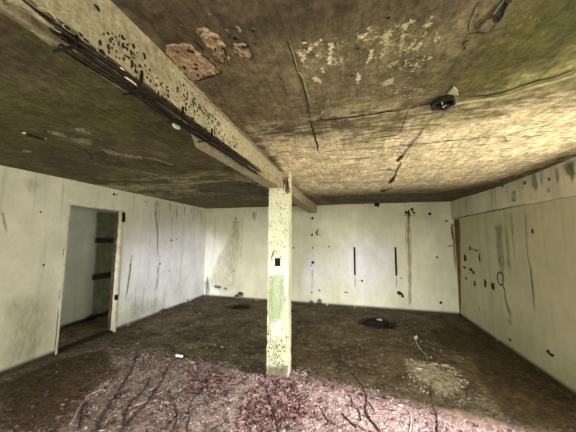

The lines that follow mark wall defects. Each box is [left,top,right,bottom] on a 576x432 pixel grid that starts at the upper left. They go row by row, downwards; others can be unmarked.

spalling [8,0,262,175]
crack [285,41,576,184]